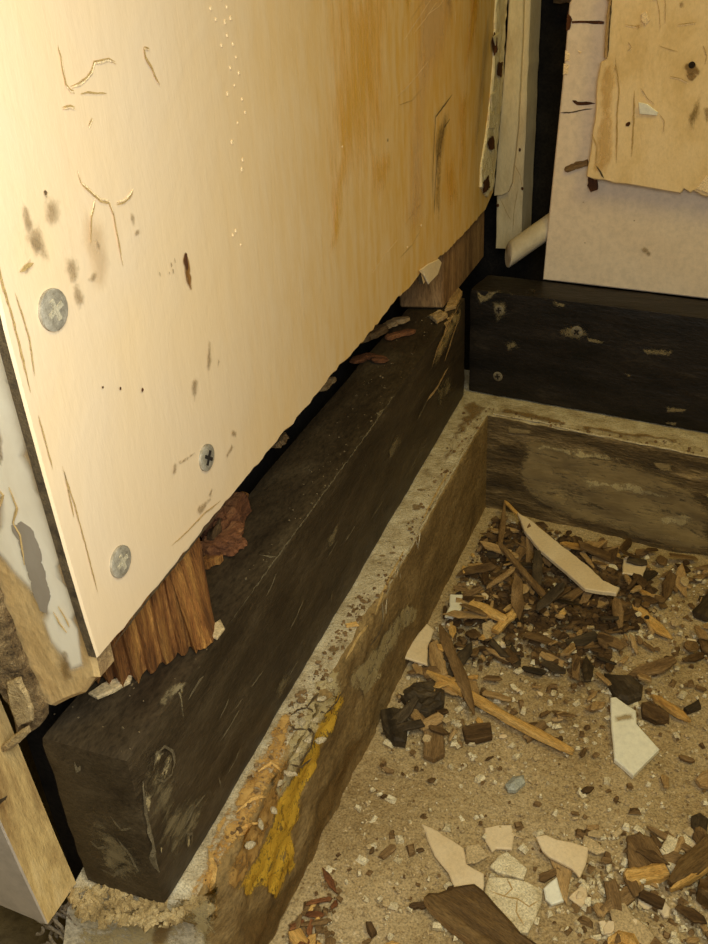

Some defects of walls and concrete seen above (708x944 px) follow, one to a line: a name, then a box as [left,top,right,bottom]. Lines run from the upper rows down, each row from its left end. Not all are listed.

peeling [0,354,82,677]
spalling [277,669,340,786]
crack [287,693,342,768]